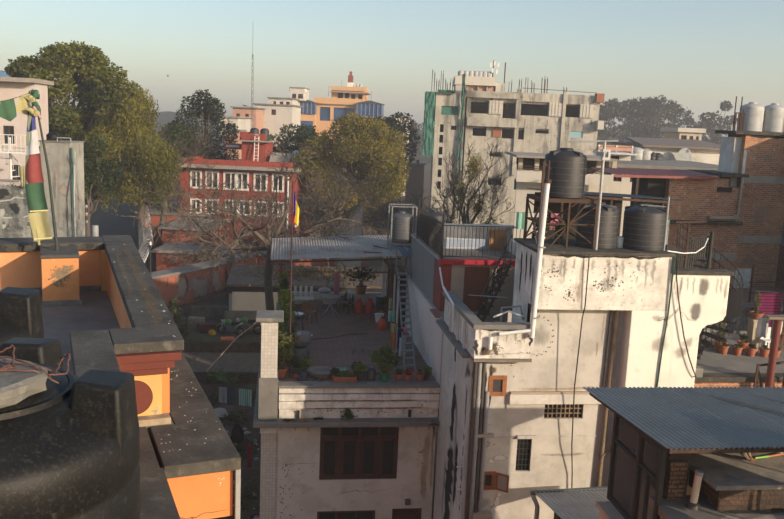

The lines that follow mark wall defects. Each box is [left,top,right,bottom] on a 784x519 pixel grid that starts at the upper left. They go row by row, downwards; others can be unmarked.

peeling [48,261,76,287]
leakage [692,304,700,320]
leakage [443,363,496,519]